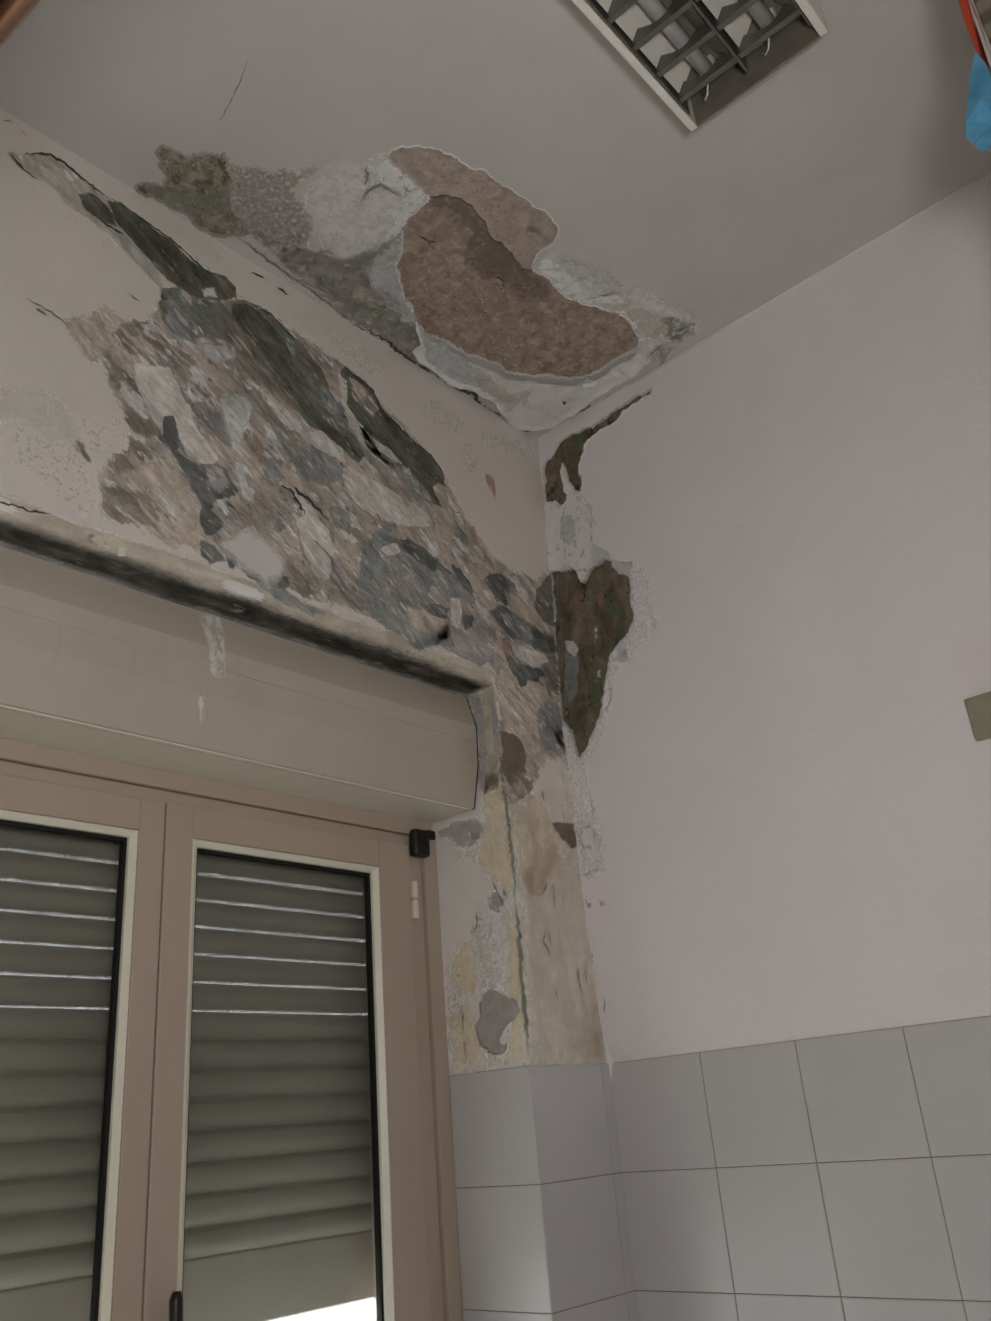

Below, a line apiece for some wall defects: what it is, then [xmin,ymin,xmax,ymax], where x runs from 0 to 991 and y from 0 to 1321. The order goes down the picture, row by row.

water stain [0,379,602,1068]
peeling [8,144,695,804]
spalling [448,911,520,1057]
spalling [552,822,577,848]